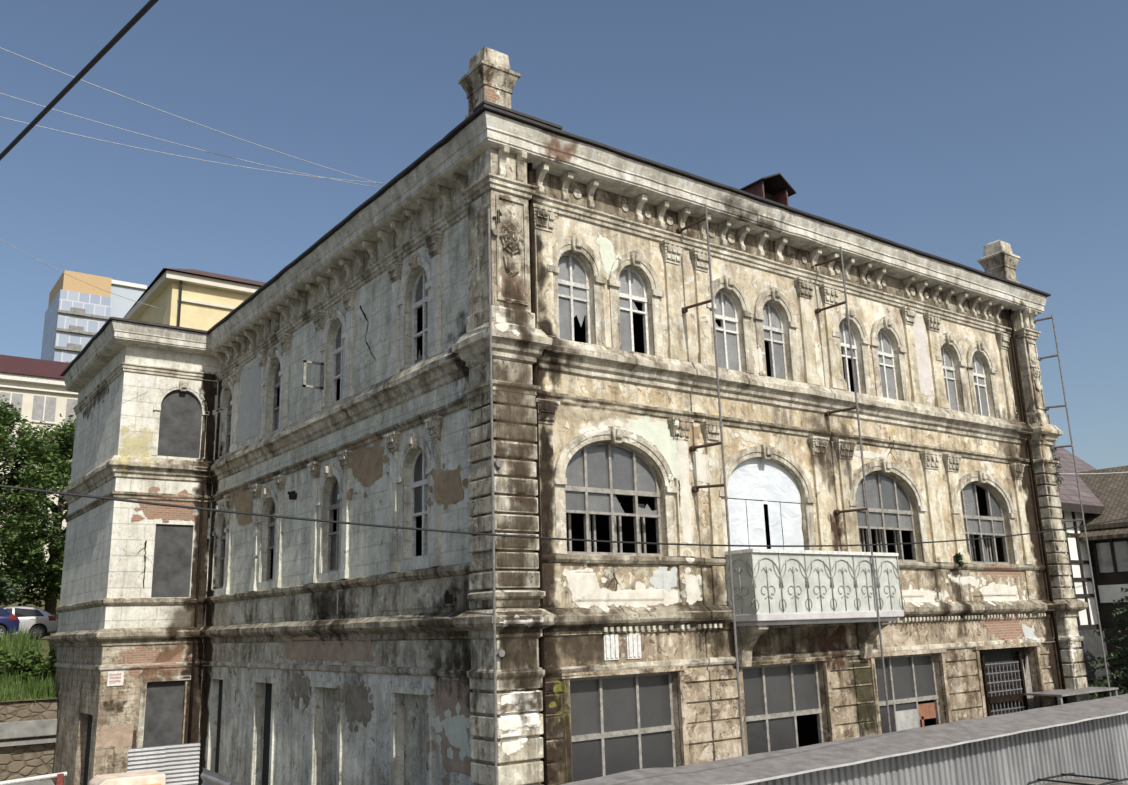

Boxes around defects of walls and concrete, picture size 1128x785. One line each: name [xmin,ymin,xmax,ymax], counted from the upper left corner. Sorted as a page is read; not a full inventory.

flaking render [131,486,197,523]
flaking render [338,433,389,500]
spalling [427,463,468,510]
water stain [496,194,608,785]
peeling [562,406,716,613]
crack [136,541,147,588]
water stain [169,371,223,785]
flaking render [899,565,1076,678]
flaking render [277,630,373,709]
peeling [337,680,374,732]
peeling [498,683,570,755]
water stain [752,625,878,736]